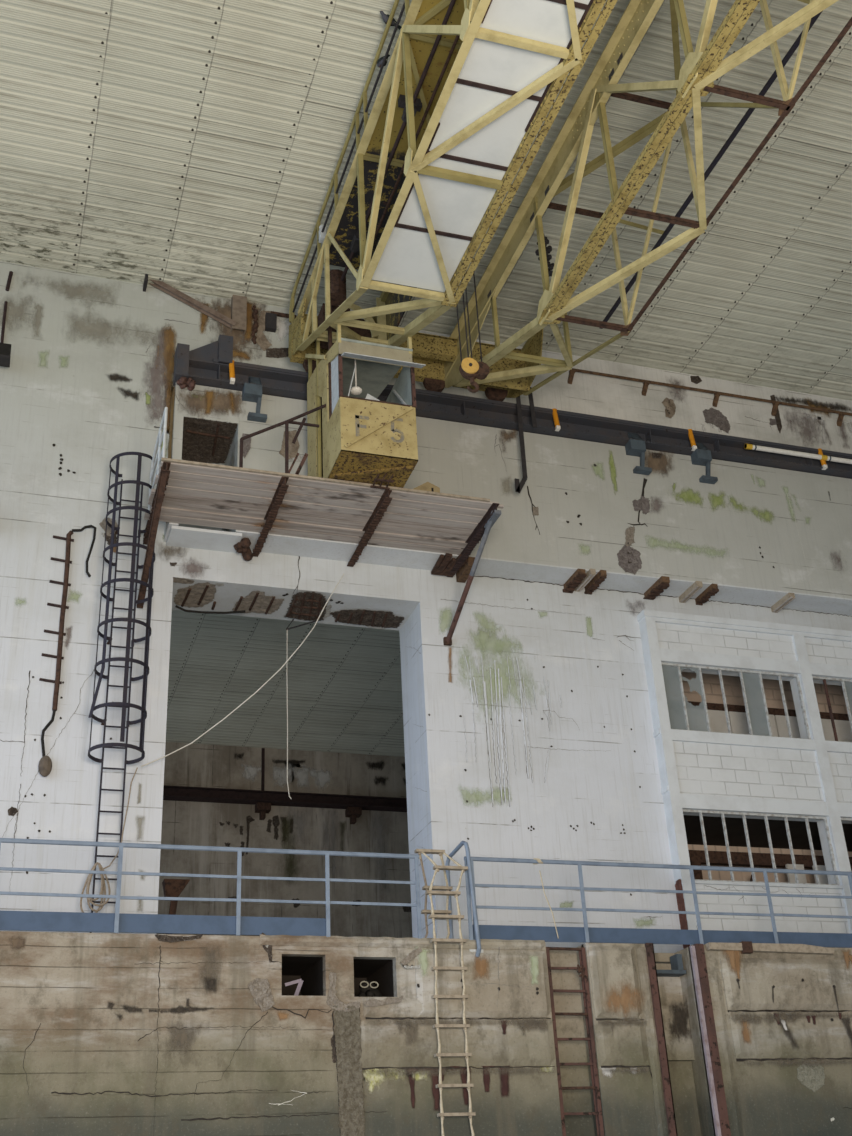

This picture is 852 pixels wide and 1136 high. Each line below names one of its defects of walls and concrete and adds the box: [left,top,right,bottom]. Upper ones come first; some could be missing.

damp [53,284,110,301]
damp [0,301,42,335]
damp [73,317,155,341]
spalling [702,408,730,433]
spalling [617,545,642,575]
spalling [170,562,224,610]
spalling [232,591,404,629]
crack [23,946,555,1136]
rust [407,1066,509,1110]